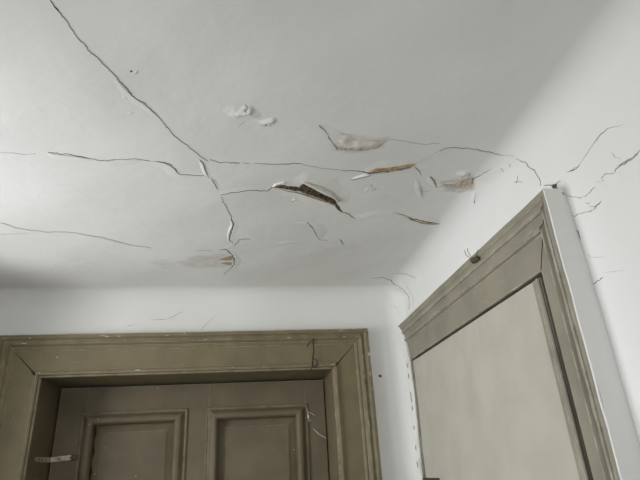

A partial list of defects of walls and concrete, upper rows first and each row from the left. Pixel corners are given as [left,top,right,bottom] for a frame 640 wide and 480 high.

crack [0,0,541,270]
spalling [443,168,502,203]
crack [569,125,640,241]